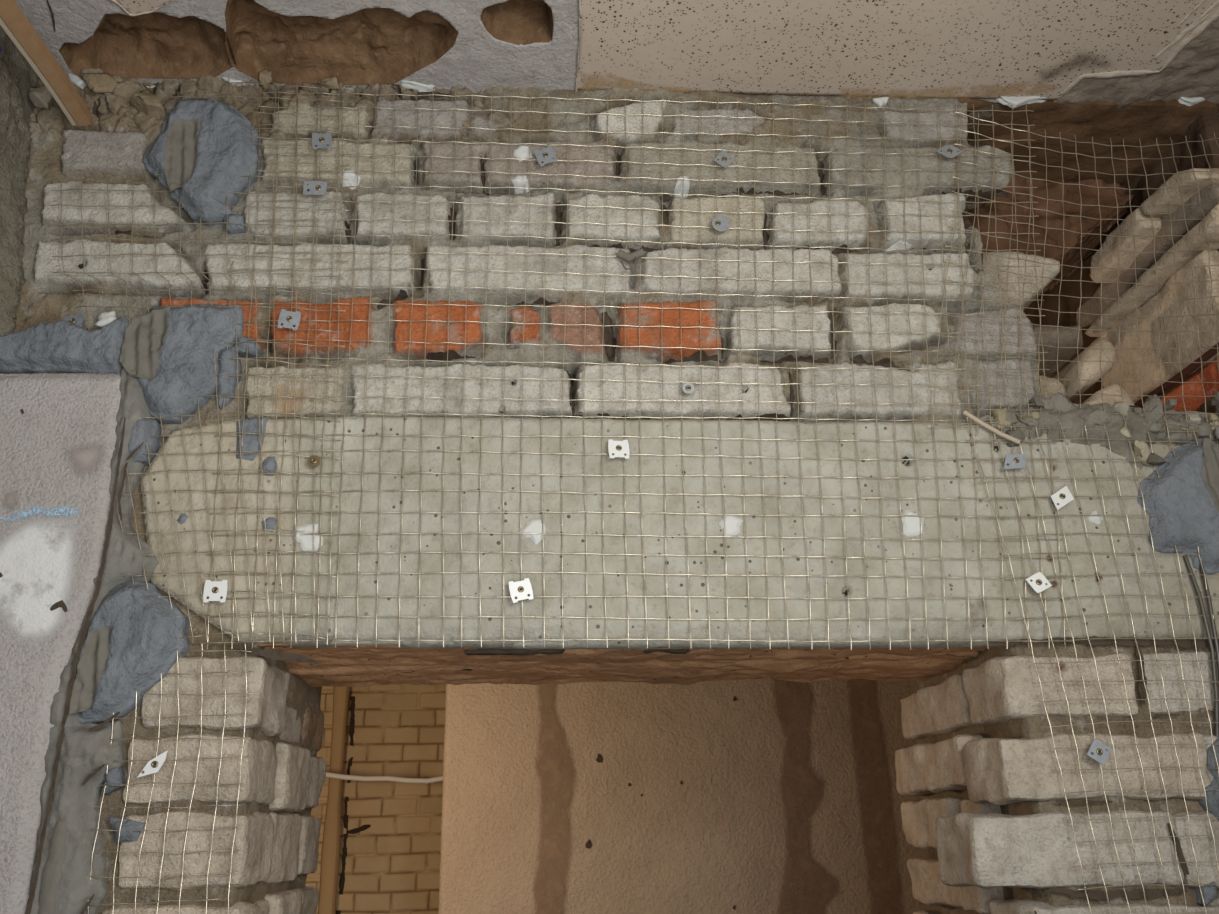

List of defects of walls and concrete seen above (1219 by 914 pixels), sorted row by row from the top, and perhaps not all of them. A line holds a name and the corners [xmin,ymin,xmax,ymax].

peeling [14,0,581,97]
spalling [957,0,1219,411]
leakage [535,684,574,914]
leakage [774,679,837,914]